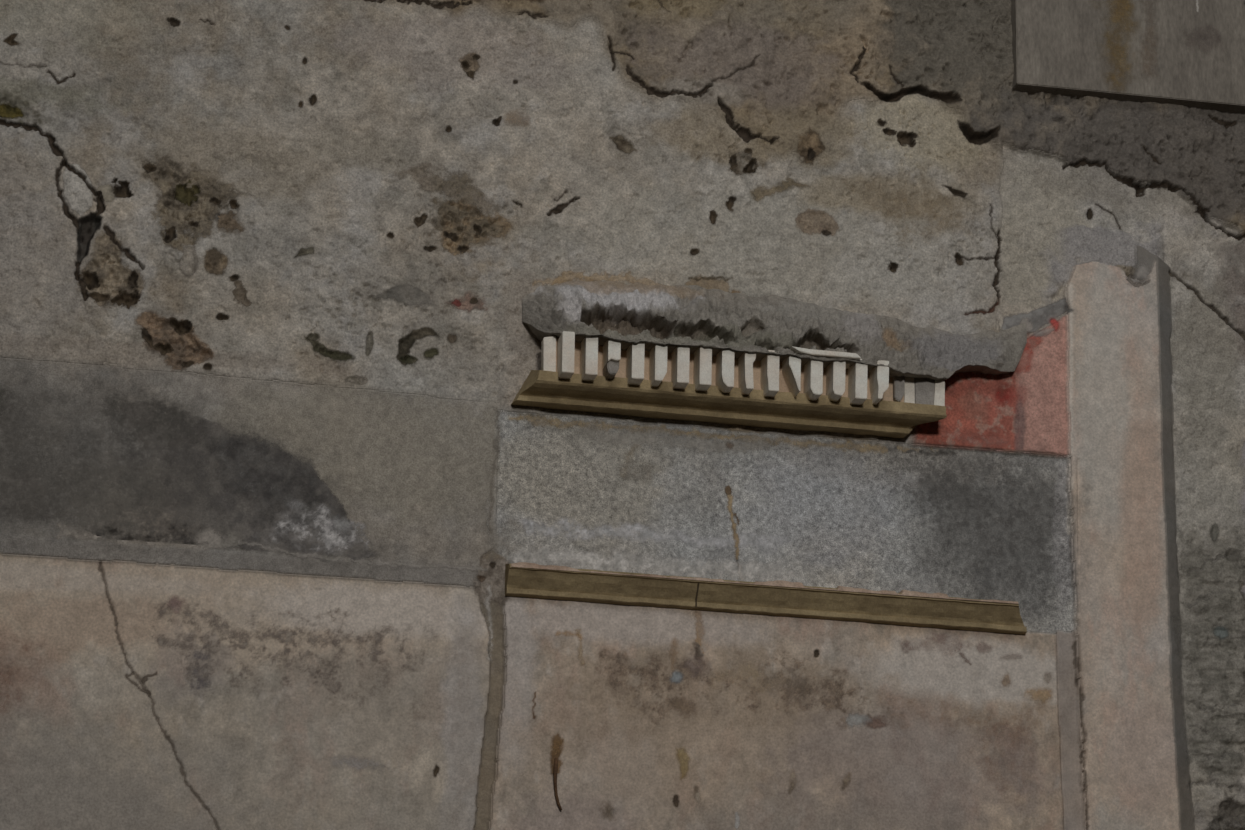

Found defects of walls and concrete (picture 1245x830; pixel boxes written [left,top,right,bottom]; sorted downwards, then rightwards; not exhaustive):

crack [608,37,779,144]
crack [0,119,144,301]
spalling [78,233,213,370]
spalling [143,155,252,306]
spalling [398,164,511,255]
spalling [522,280,1073,380]
crack [960,204,1001,315]
crack [1062,146,1245,241]
crack [1168,272,1245,341]
damp [0,390,487,571]
crack [98,562,219,830]